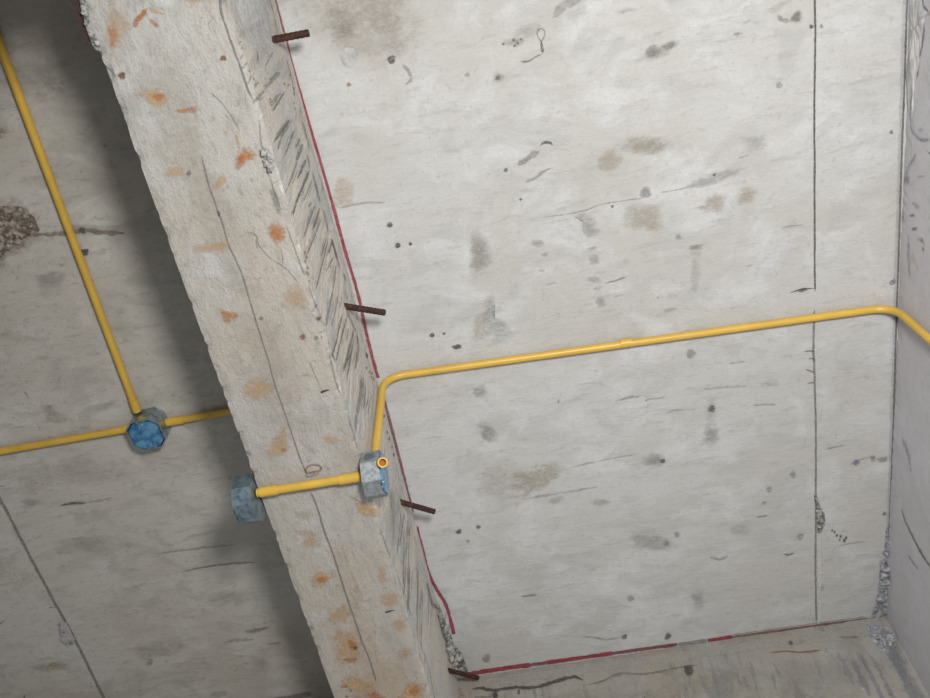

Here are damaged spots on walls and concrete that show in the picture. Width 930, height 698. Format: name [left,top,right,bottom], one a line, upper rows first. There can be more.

spalling [382,497,436,514]
spalling [396,518,480,680]
spalling [867,526,896,651]